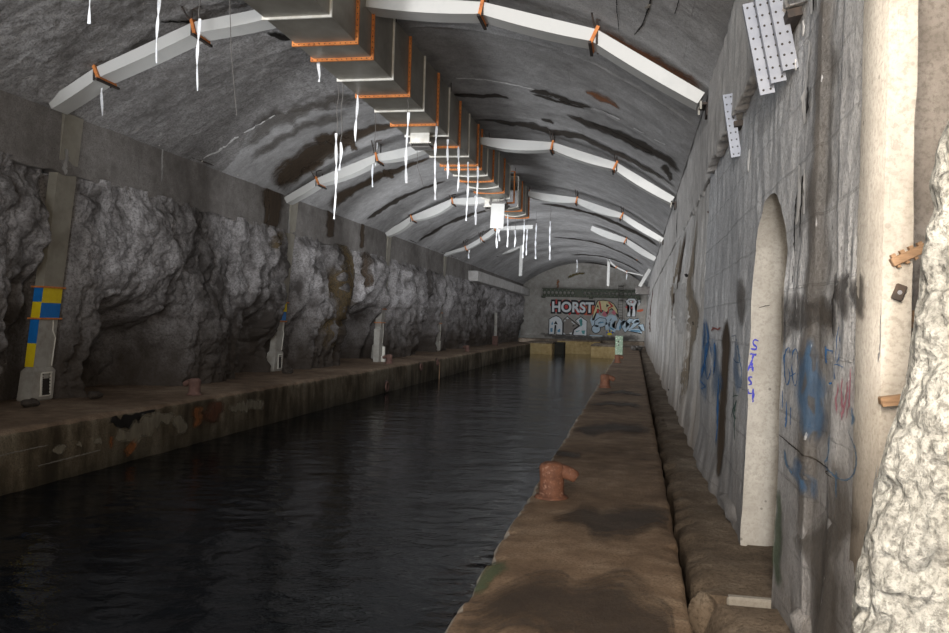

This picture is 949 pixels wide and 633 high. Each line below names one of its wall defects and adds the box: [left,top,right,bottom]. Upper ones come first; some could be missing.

crack [616,0,651,35]
water stain [250,95,395,233]
water stain [481,90,678,184]
rust [586,91,618,108]
water stain [717,322,730,476]